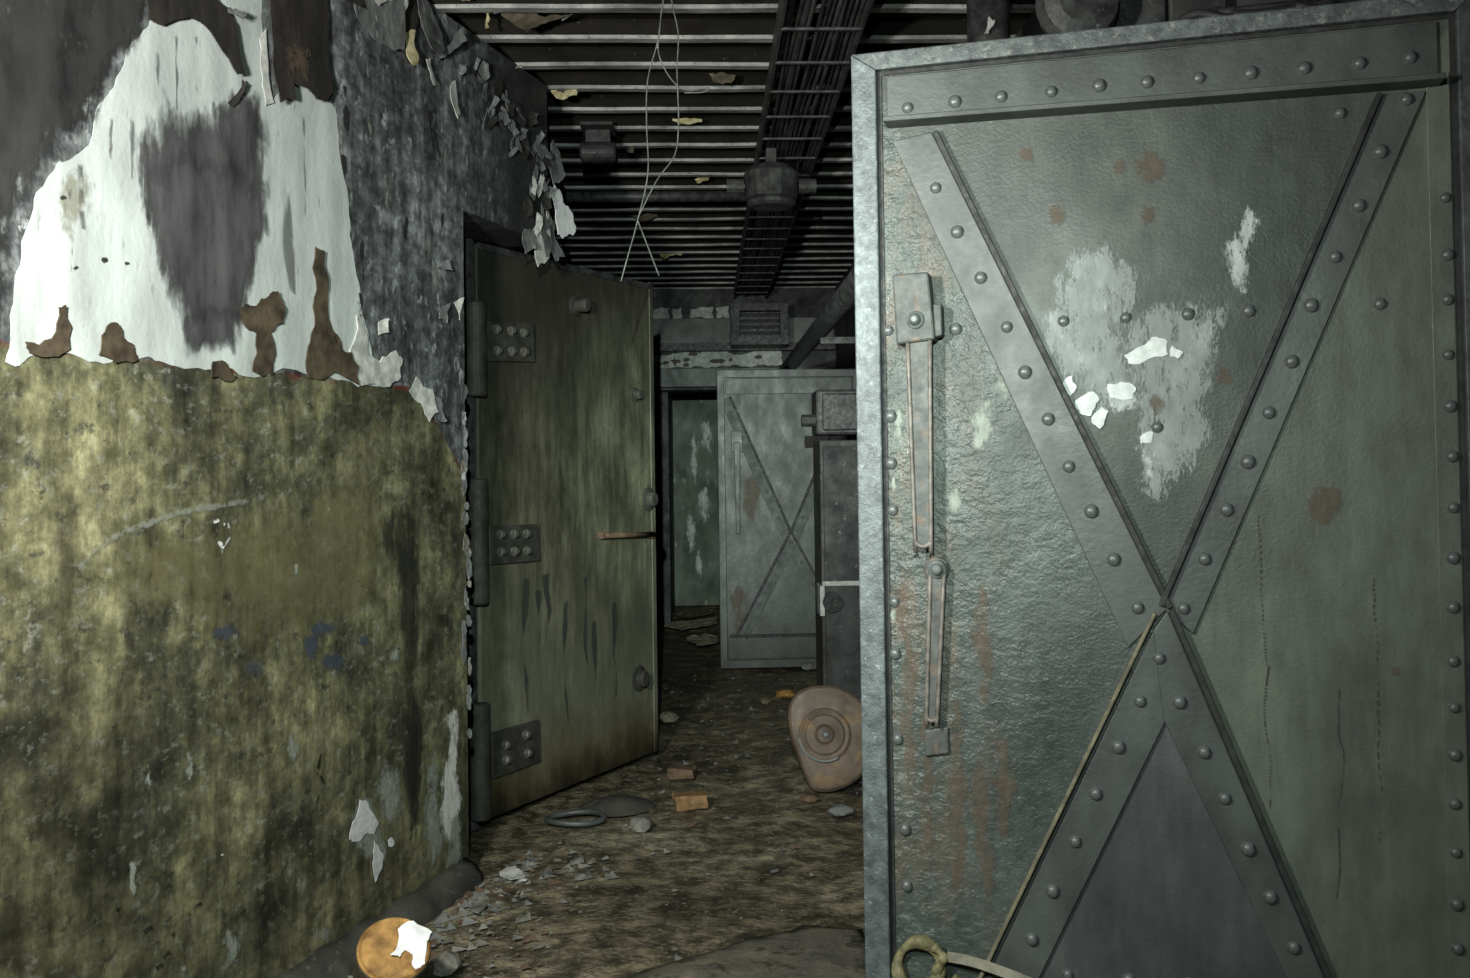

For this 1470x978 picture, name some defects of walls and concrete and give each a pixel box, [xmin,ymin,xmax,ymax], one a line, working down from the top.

leakage [219,94,261,187]
peeling [348,0,578,267]
peeling [1225,206,1259,293]
leakage [184,307,240,351]
peeling [5,0,472,710]
peeling [1040,246,1229,500]
leakage [112,500,246,553]
leakage [383,509,419,662]
flaking render [349,764,403,882]
leakage [403,690,462,868]
leakage [223,930,240,964]